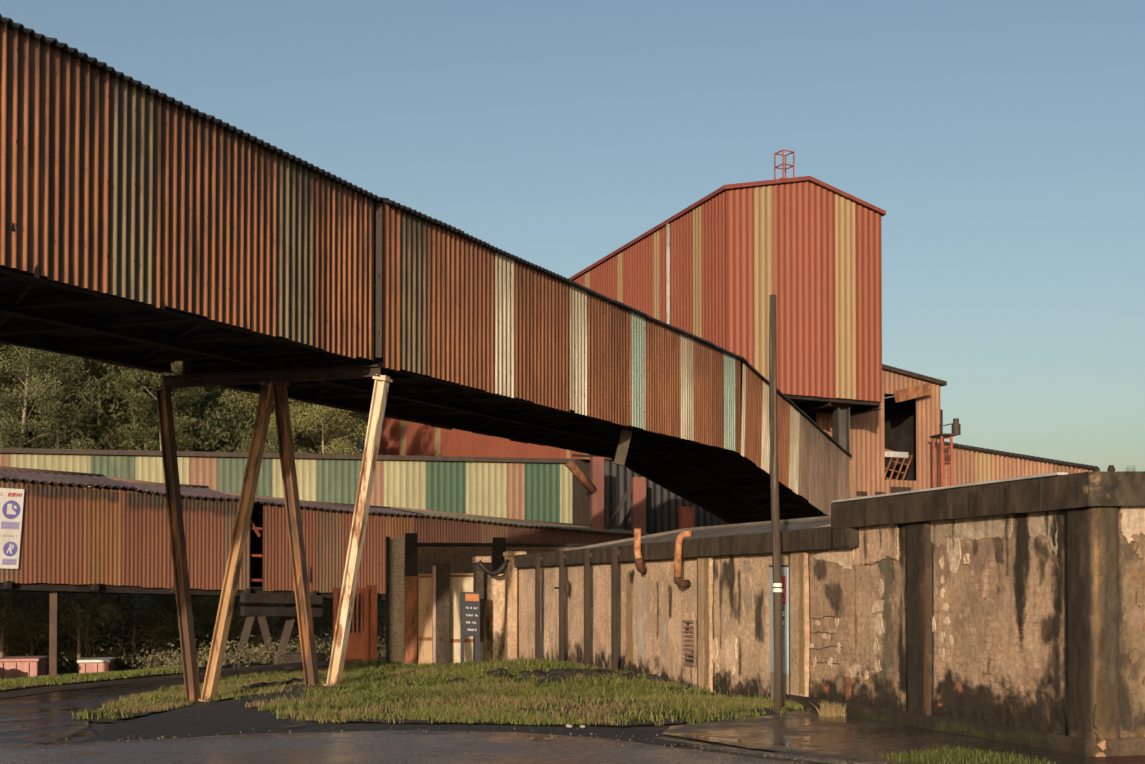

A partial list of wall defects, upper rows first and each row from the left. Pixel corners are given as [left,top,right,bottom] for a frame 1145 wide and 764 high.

peeling [1028,511,1058,555]
peeling [1120,506,1145,559]
peeling [809,618,841,667]
peeling [846,579,885,703]
peeling [931,515,1013,661]
water stain [808,486,1145,735]
spalling [1041,616,1054,643]